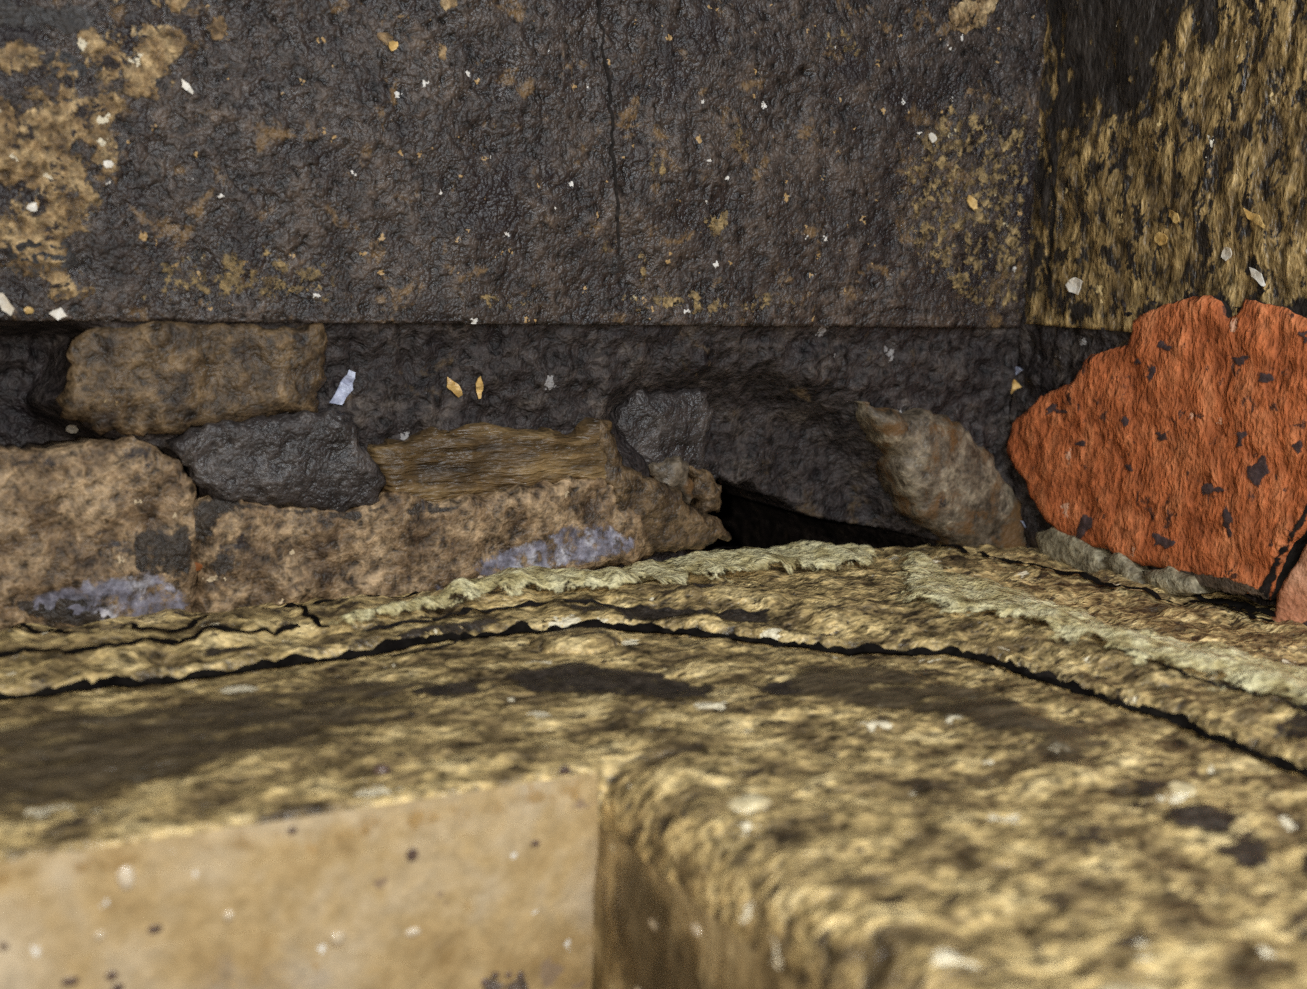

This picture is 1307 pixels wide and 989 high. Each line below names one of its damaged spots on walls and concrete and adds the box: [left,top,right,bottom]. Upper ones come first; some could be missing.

crack [0,591,1307,779]